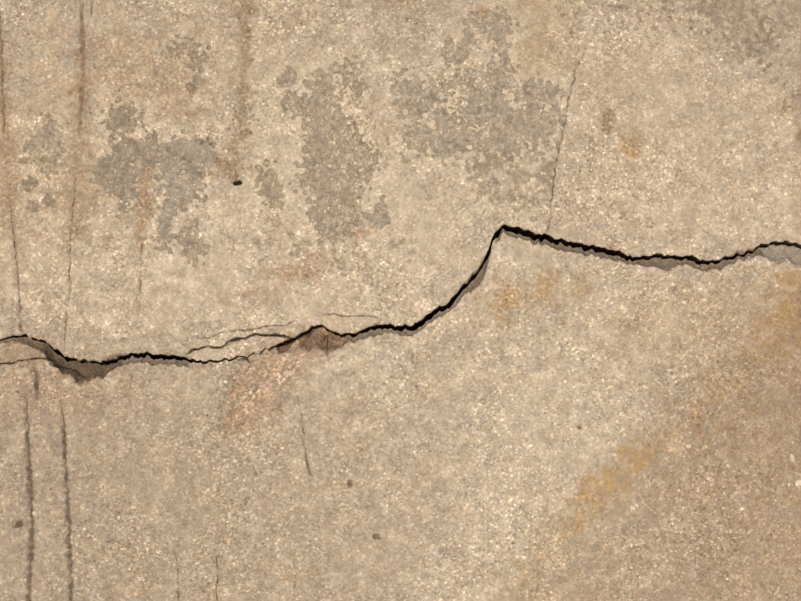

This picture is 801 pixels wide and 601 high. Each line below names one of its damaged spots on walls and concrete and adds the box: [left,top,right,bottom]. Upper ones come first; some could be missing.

crack [0,224,801,384]